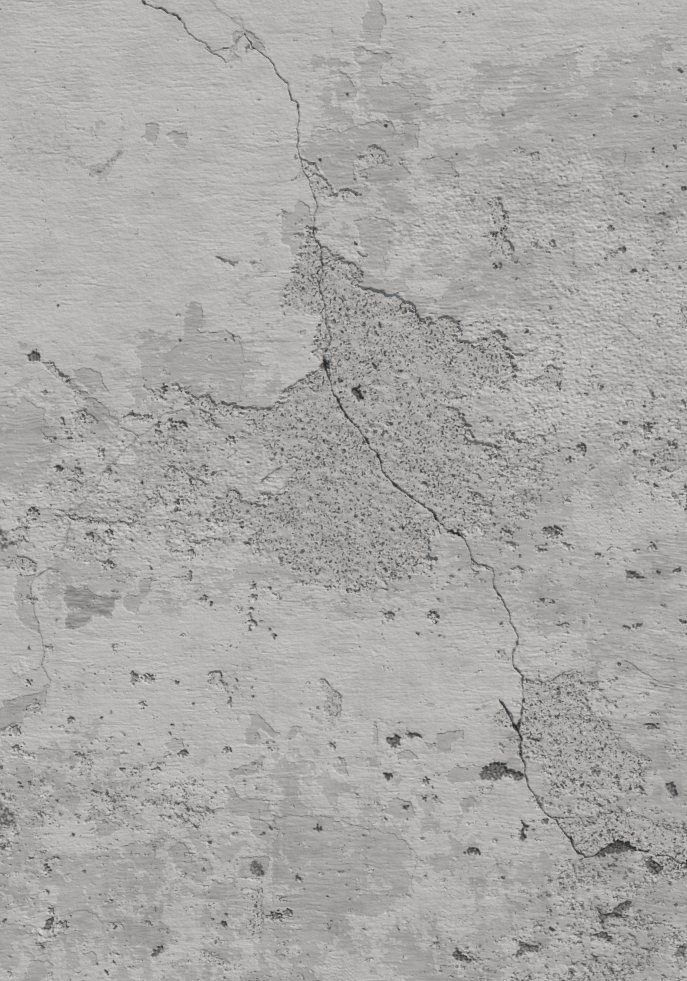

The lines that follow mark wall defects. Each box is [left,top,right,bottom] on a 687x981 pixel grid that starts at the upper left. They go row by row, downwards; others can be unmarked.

flaking render [41,0,557,595]
flaking render [530,363,564,396]
crack [140,0,598,860]
crack [29,408,184,682]
spalling [533,525,574,554]
peeling [63,565,153,631]
spalling [245,581,272,633]
spalling [425,597,442,624]
crack [623,659,676,689]
flaking render [491,671,687,887]
crack [638,849,687,866]